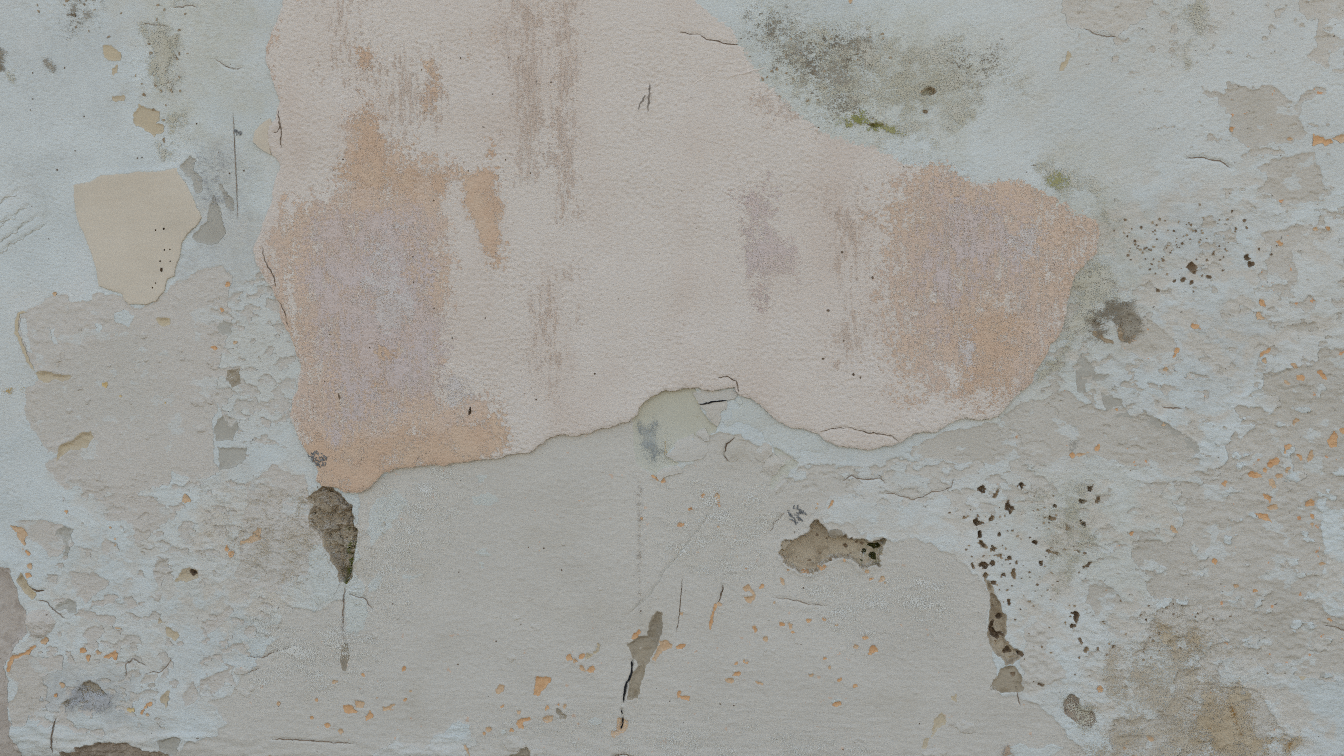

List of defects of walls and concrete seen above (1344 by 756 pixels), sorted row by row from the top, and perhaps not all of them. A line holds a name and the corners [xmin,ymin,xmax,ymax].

leakage [59,0,104,38]
leakage [740,0,1145,421]
peeling [1103,215,1252,307]
peeling [173,0,1200,756]
peeling [10,520,119,568]
spalling [153,556,217,586]
flaking render [0,563,184,756]